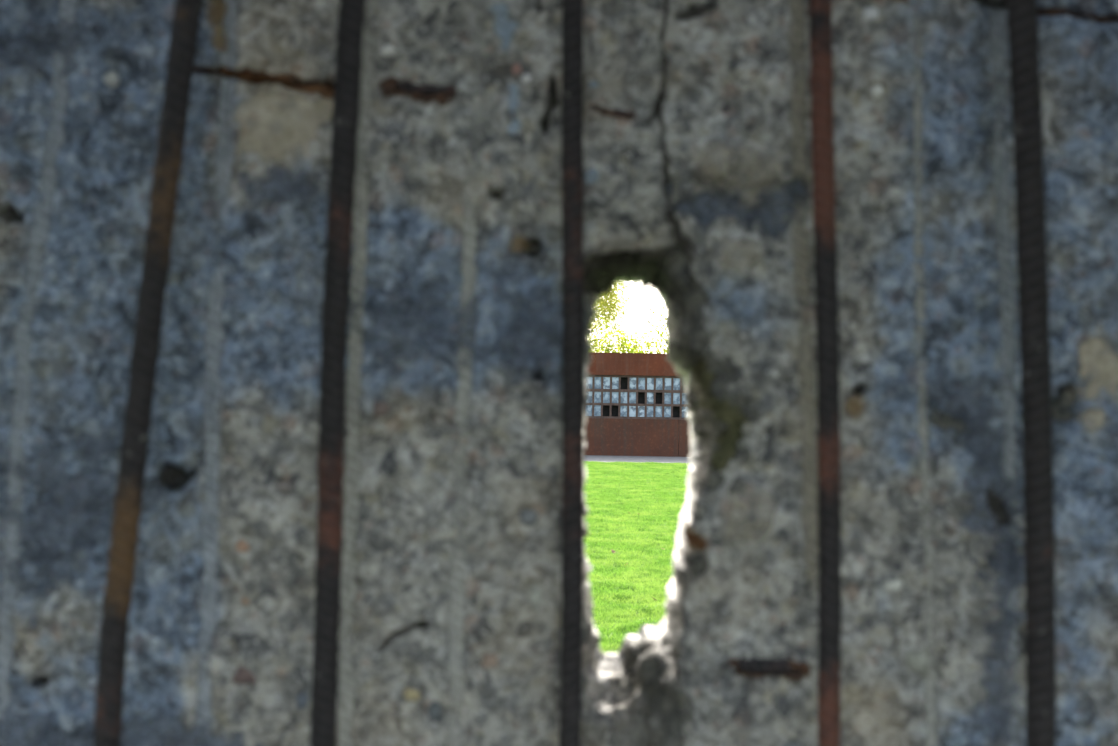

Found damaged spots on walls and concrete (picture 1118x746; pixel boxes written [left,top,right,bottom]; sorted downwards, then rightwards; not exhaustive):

corrosion [379,77,456,106]
crack [641,0,693,269]
spalling [93,0,203,746]
spalling [665,0,864,746]
corrosion [729,656,811,682]